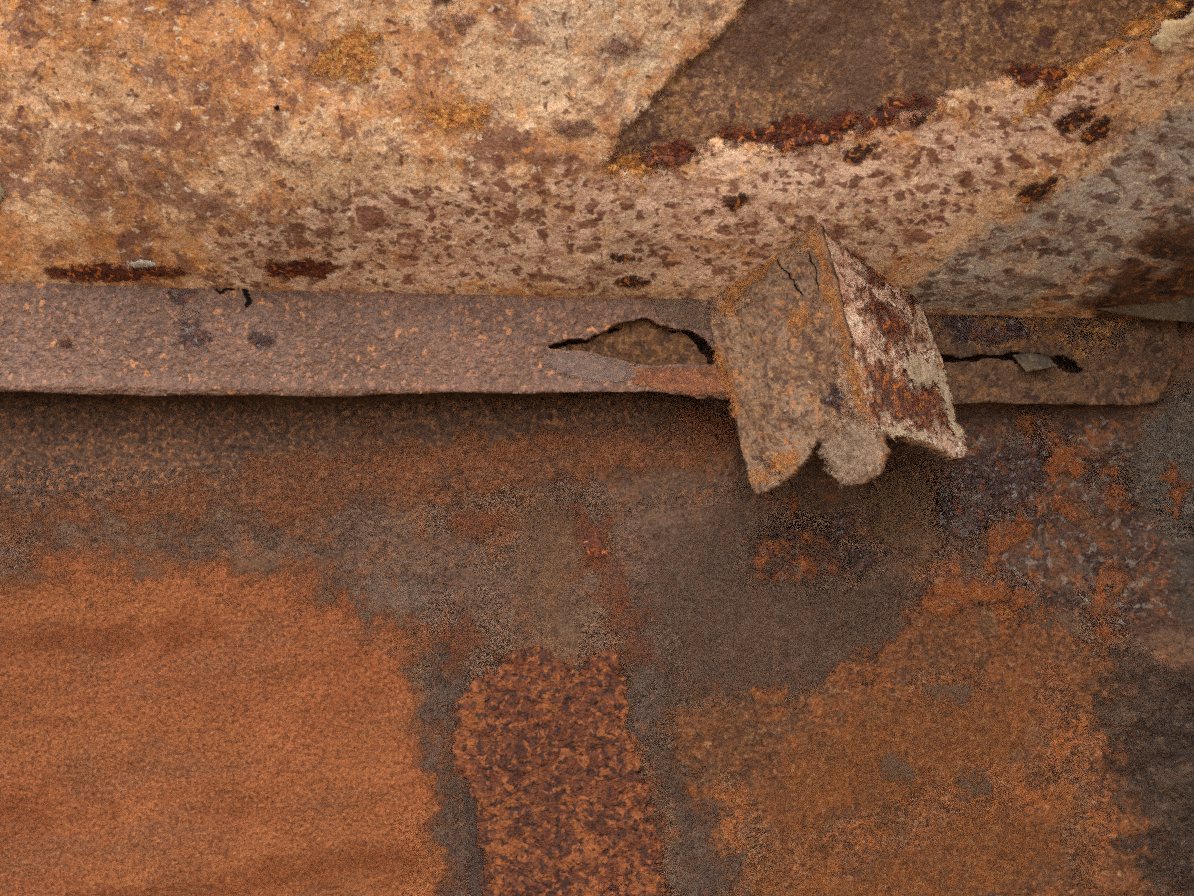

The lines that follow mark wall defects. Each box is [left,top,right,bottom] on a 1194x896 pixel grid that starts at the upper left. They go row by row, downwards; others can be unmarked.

rust [603,91,938,178]
peeling [613,0,1194,174]
rust [44,261,212,352]
rust [264,257,341,280]
damp [516,498,582,662]
rust [0,348,1167,896]